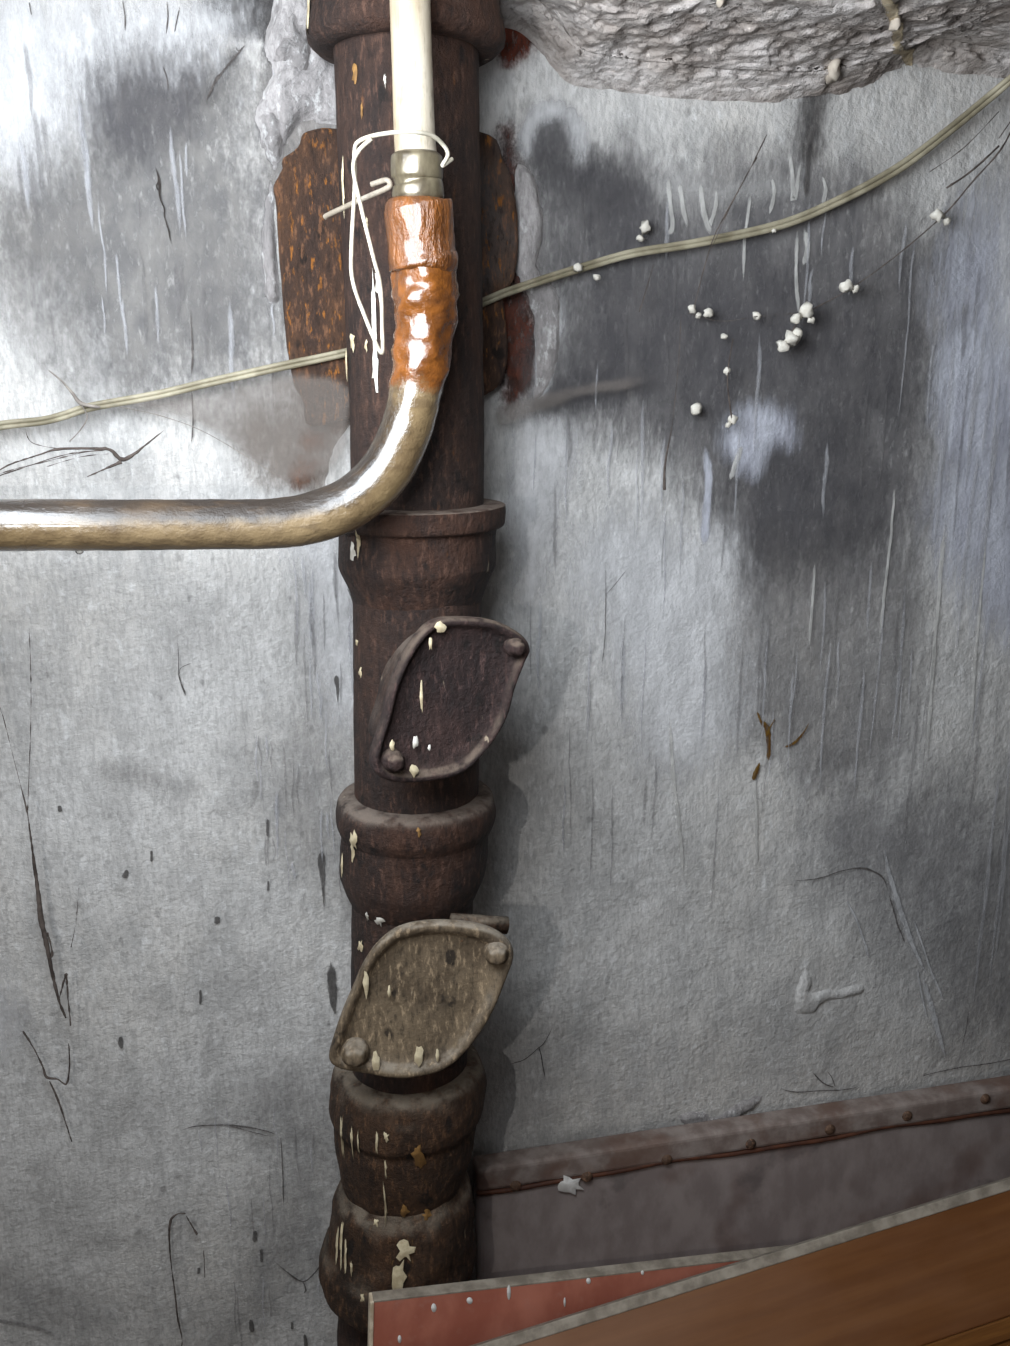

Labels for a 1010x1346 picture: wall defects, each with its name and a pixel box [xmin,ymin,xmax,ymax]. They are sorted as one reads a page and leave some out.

water stain [0,0,285,393]
spalling [200,0,337,303]
water stain [508,92,1010,873]